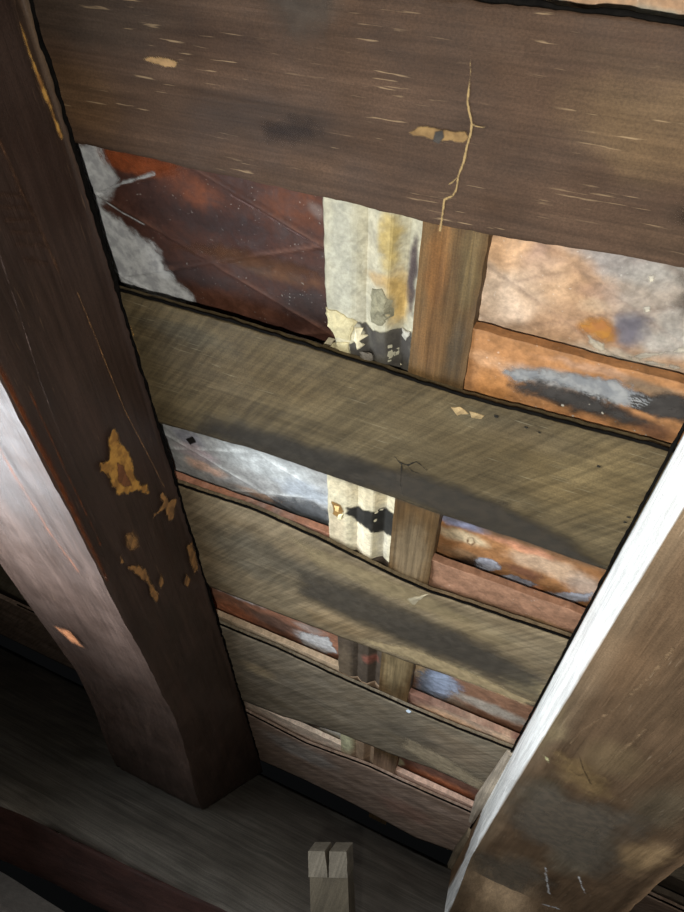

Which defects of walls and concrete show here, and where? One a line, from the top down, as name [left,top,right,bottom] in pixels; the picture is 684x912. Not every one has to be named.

spalling [410,127,468,143]
crack [439,63,483,232]
peeling [100,429,149,494]
peeling [154,492,177,521]
peeling [127,534,138,549]
peeling [120,558,164,602]
peeling [185,543,198,587]